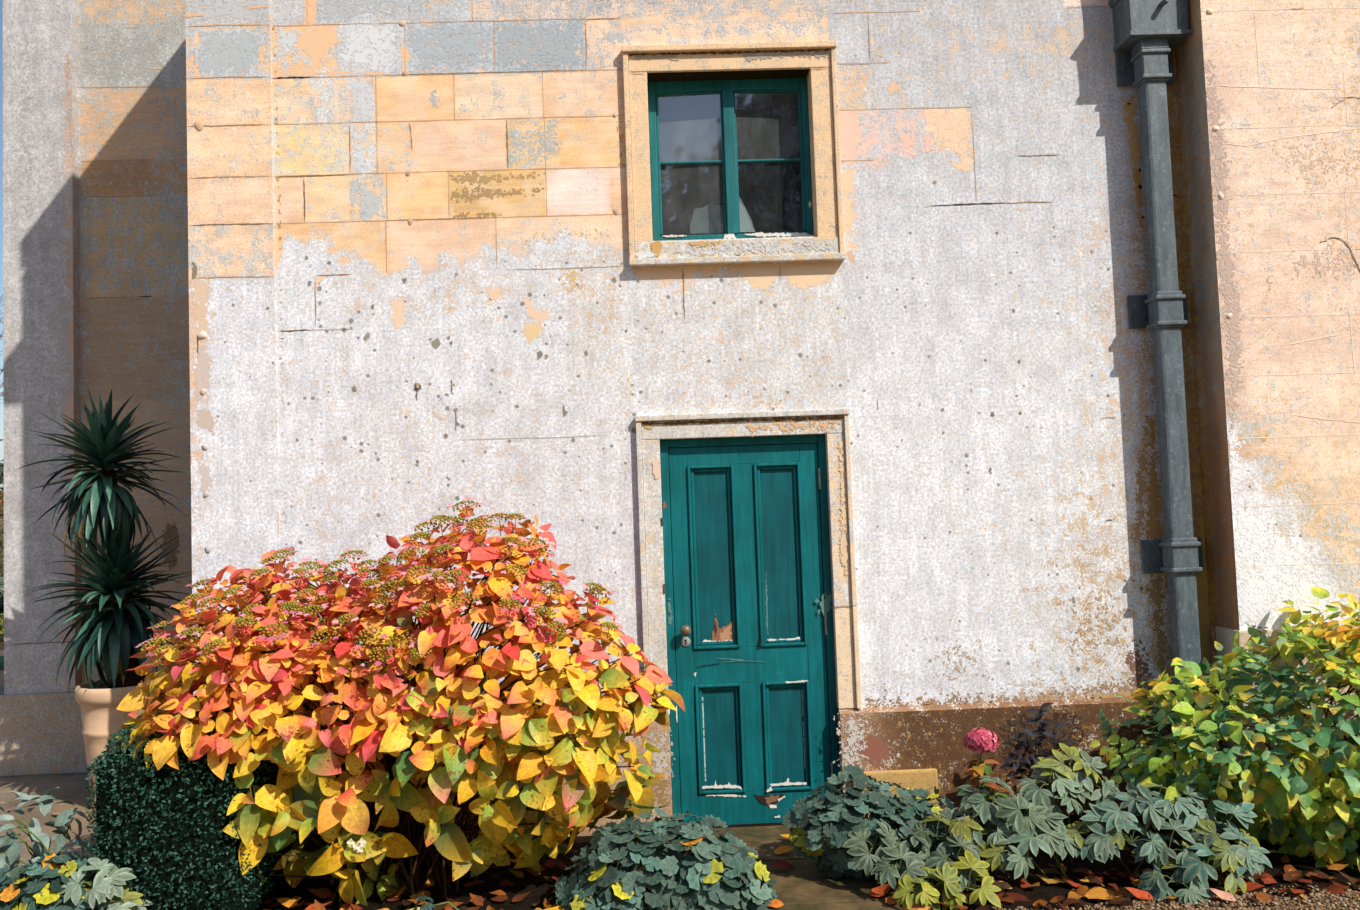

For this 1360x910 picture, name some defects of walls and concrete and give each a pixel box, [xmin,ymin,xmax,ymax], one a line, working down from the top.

peeling [273,0,412,79]
peeling [724,232,855,292]
peeling [391,278,407,330]
peeling [192,261,224,435]
damp [865,639,1153,783]